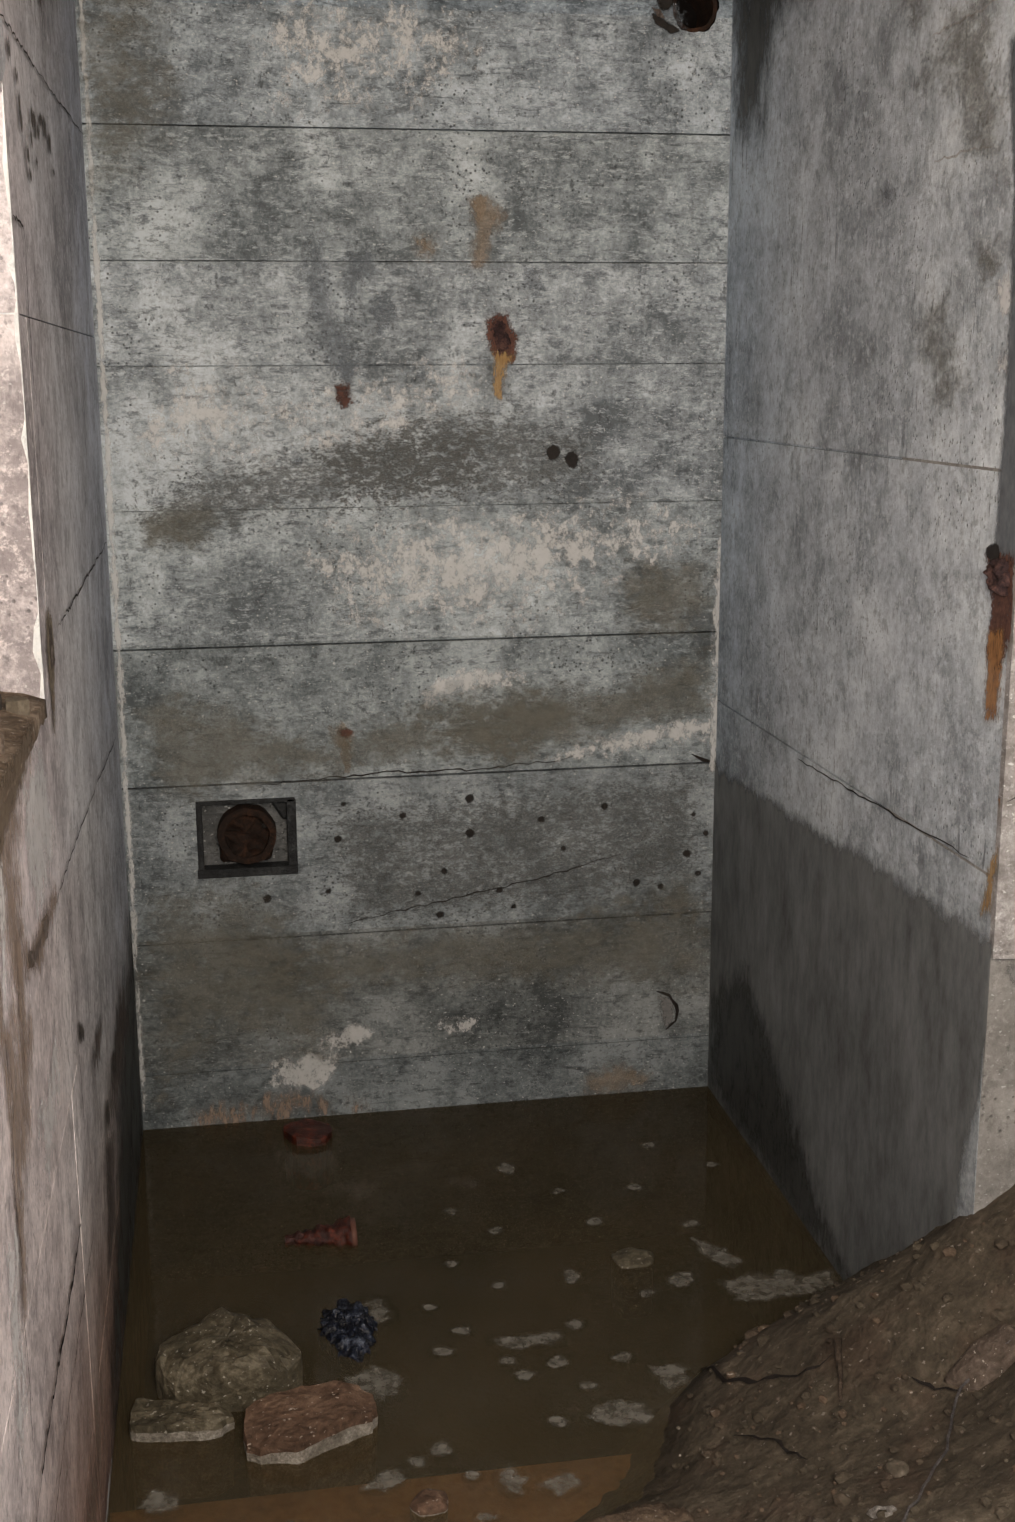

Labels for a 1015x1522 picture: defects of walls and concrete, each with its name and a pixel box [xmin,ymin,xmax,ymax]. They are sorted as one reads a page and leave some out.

leakage [269,5,468,100]
spalling [652,0,679,34]
rust [334,383,352,410]
rust [486,312,518,399]
leakage [139,364,707,629]
rust [983,544,1014,721]
leakage [0,725,60,1460]
leakage [92,908,145,1418]